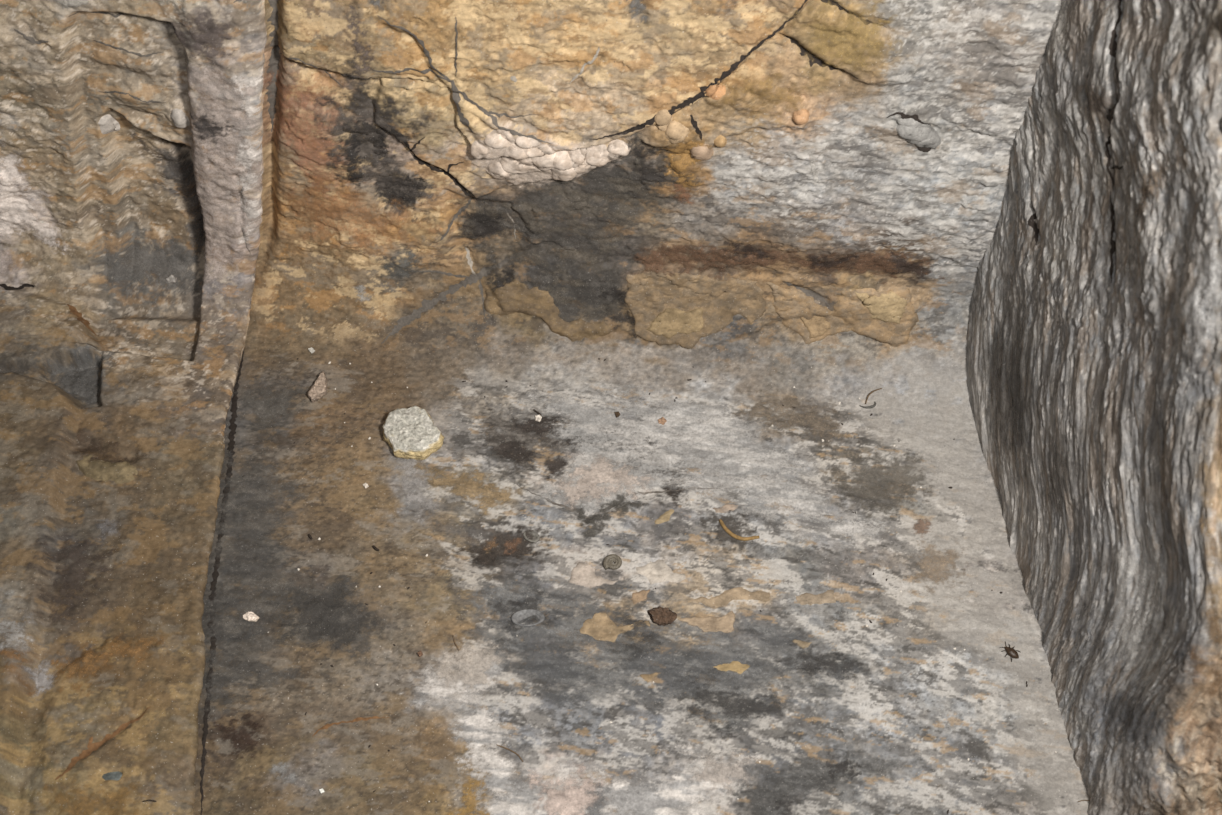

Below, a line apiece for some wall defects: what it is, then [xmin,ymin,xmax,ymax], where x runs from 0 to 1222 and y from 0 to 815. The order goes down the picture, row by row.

crack [234,0,342,132]
leakage [341,134,427,209]
crack [373,15,548,143]
crack [381,130,549,344]
leakage [466,129,666,188]
crack [593,0,887,140]
crack [1105,0,1142,284]
leakage [603,288,635,336]
leakage [415,460,521,515]
leakage [476,385,933,556]
leakage [914,519,957,583]
leakage [412,525,901,815]